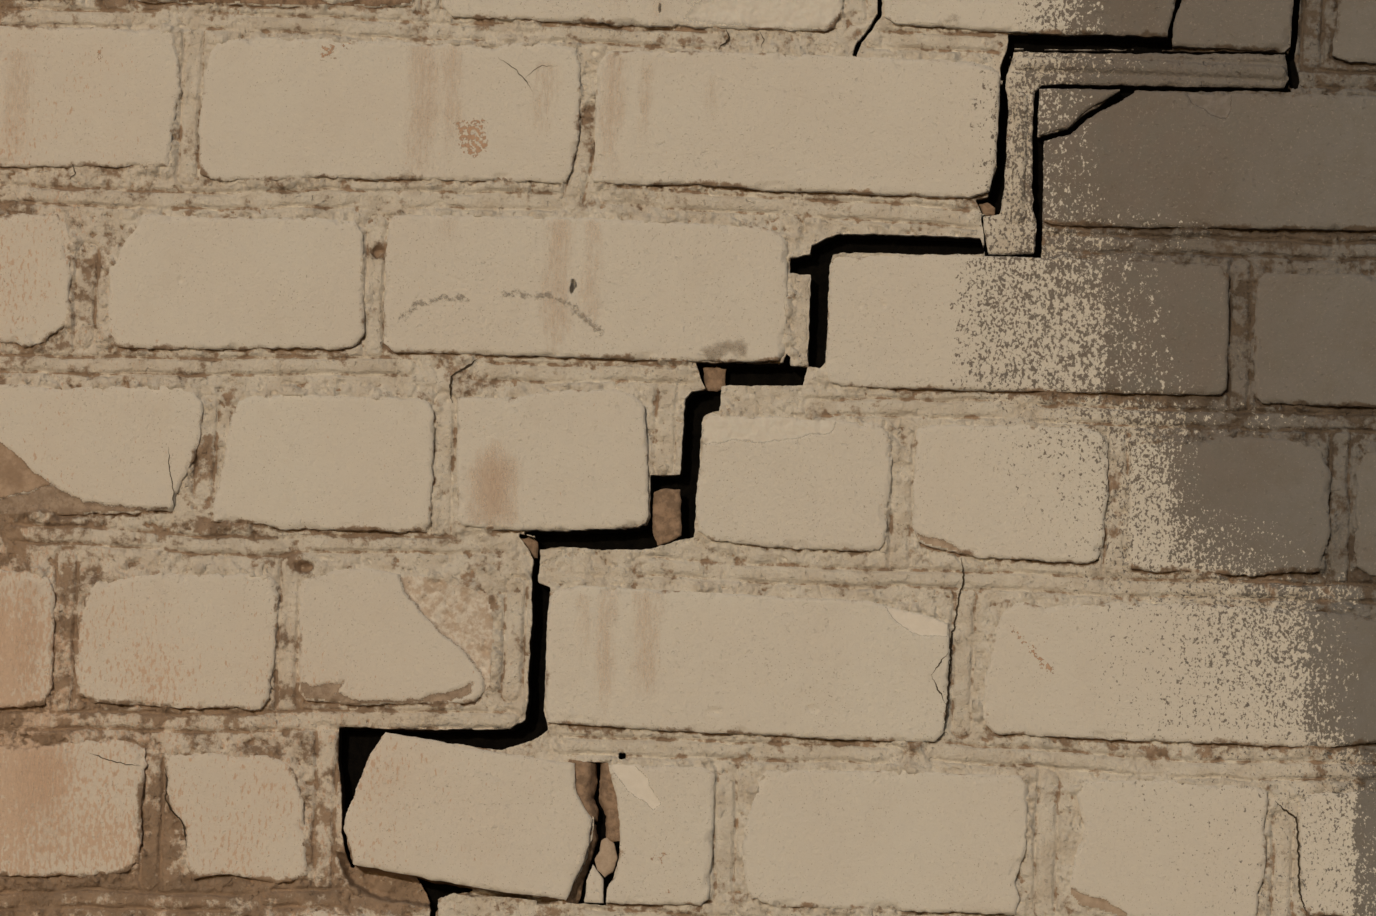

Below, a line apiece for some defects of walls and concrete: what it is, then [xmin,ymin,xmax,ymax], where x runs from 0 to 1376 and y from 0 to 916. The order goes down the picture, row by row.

crack [1284,0,1300,93]
spalling [0,442,168,514]
crack [341,0,1232,868]
spalling [300,575,494,704]
crack [420,879,473,916]
crack [578,764,620,905]